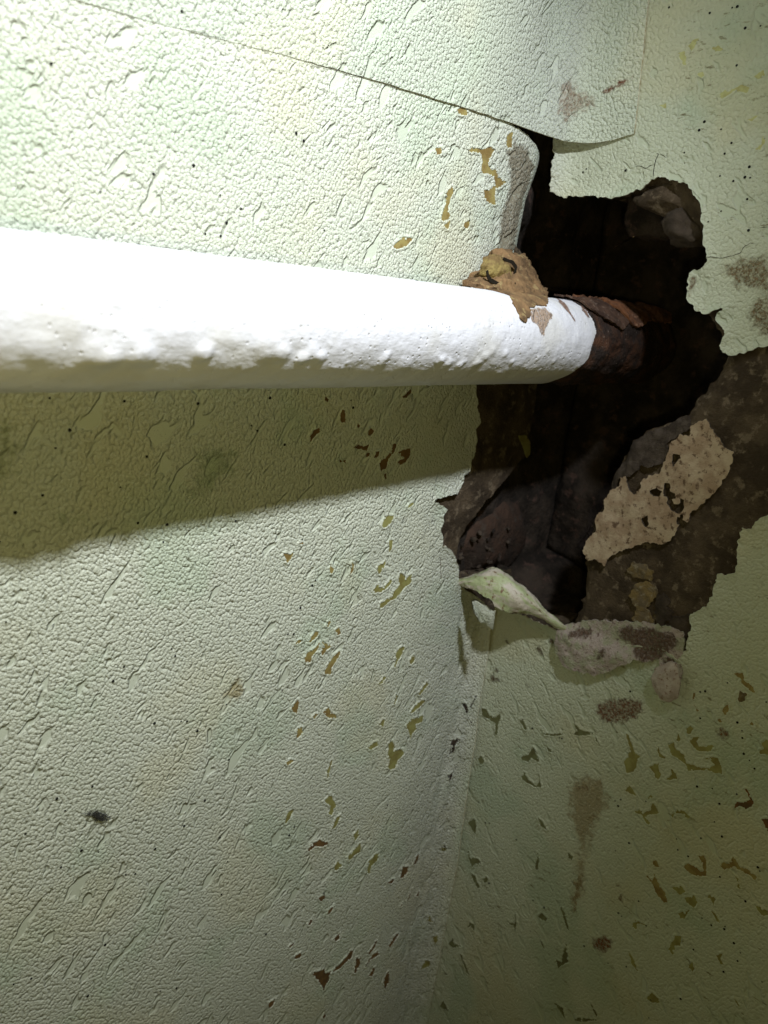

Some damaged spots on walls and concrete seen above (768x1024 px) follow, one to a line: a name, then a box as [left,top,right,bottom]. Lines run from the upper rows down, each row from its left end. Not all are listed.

peeling [439,183,471,232]
rust [531,308,552,335]
spalling [456,124,735,703]
peeling [371,500,416,610]
peeling [292,618,343,677]
peeling [289,697,338,740]
peeling [306,758,342,854]
peeling [365,680,430,772]
peeling [460,693,503,737]
peeling [518,717,602,790]
peeling [621,723,725,827]
peeling [310,931,400,994]